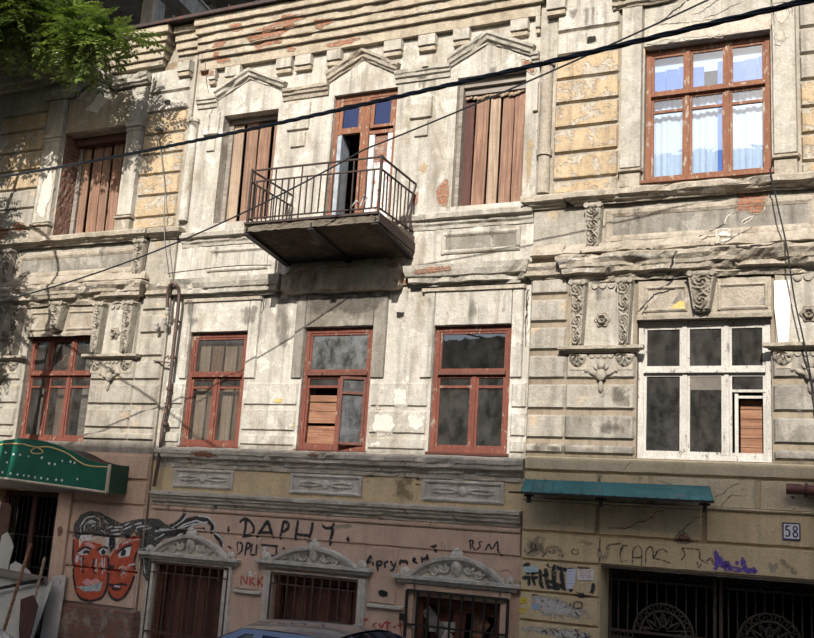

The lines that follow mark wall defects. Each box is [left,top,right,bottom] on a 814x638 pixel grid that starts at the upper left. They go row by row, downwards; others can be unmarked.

crack [657,0,739,25]
flaking render [229,14,333,52]
flaking render [199,40,230,78]
peeling [0,163,56,240]
flaking render [435,179,450,208]
crack [699,215,752,244]
flaking render [699,185,770,243]
crack [638,251,678,315]
peeling [369,388,428,447]